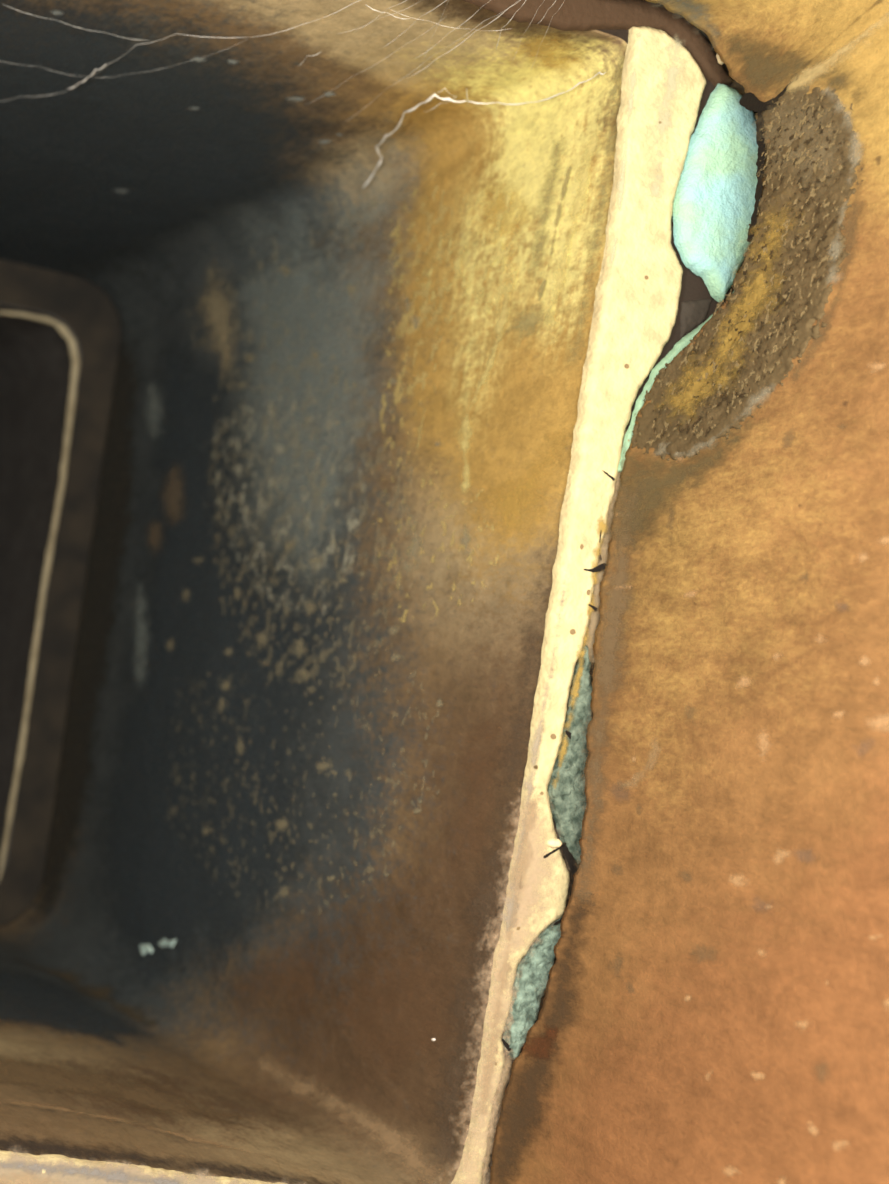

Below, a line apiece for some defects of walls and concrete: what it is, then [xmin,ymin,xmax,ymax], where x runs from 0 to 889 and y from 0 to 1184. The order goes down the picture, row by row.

spalling [628,85,868,461]
peeling [547,838,562,848]